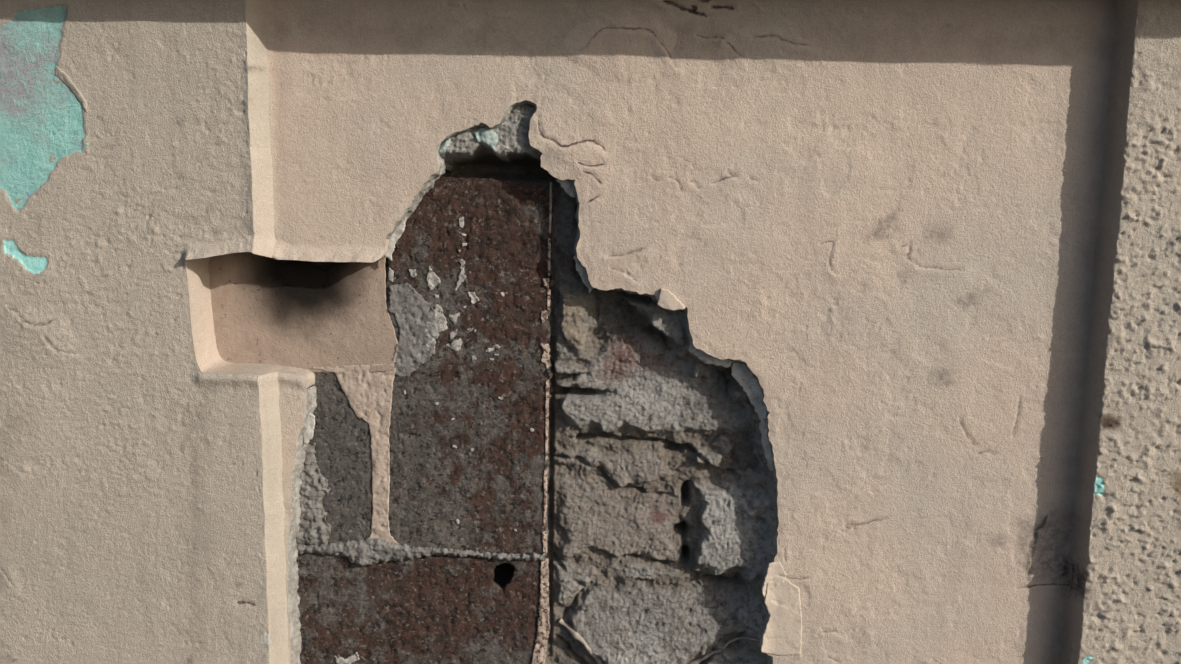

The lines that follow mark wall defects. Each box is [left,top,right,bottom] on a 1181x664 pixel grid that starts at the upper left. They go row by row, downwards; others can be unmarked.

peeling [3,239,47,274]
peeling [0,5,93,212]
peeling [409,217,500,361]
flaking render [385,100,542,282]
flaking render [530,178,802,664]
flaking render [287,384,331,664]
peeling [334,652,360,664]